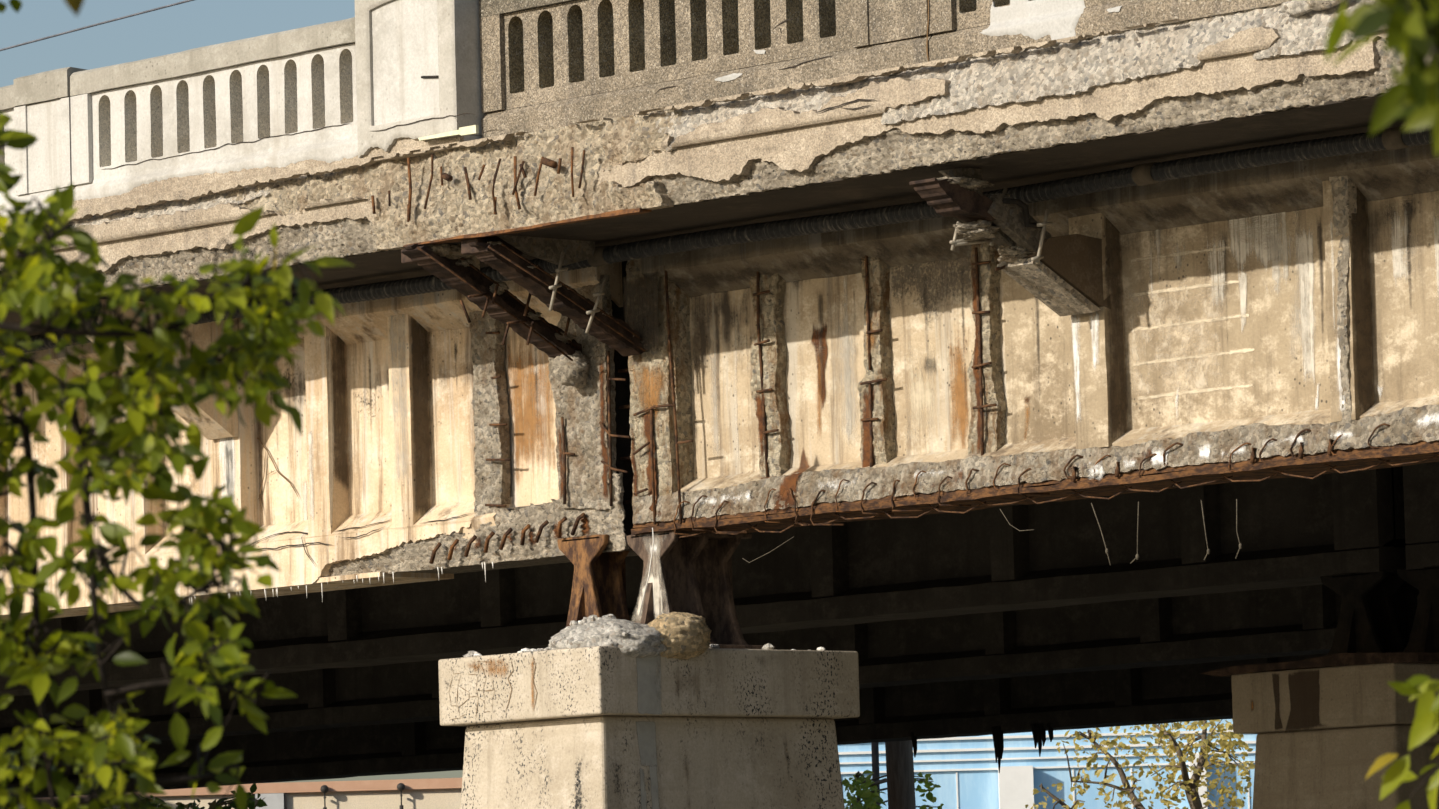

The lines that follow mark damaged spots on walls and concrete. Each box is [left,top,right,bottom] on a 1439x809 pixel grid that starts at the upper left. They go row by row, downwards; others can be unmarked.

spalling [66,0,1403,295]
damp [1072,170,1439,439]
corrosion [600,364,608,498]
corrosion [773,449,809,513]
corrosion [811,324,828,430]
corrosion [862,392,874,468]
spalling [329,176,1439,577]
damp [1125,450,1168,467]
damp [1199,445,1244,457]